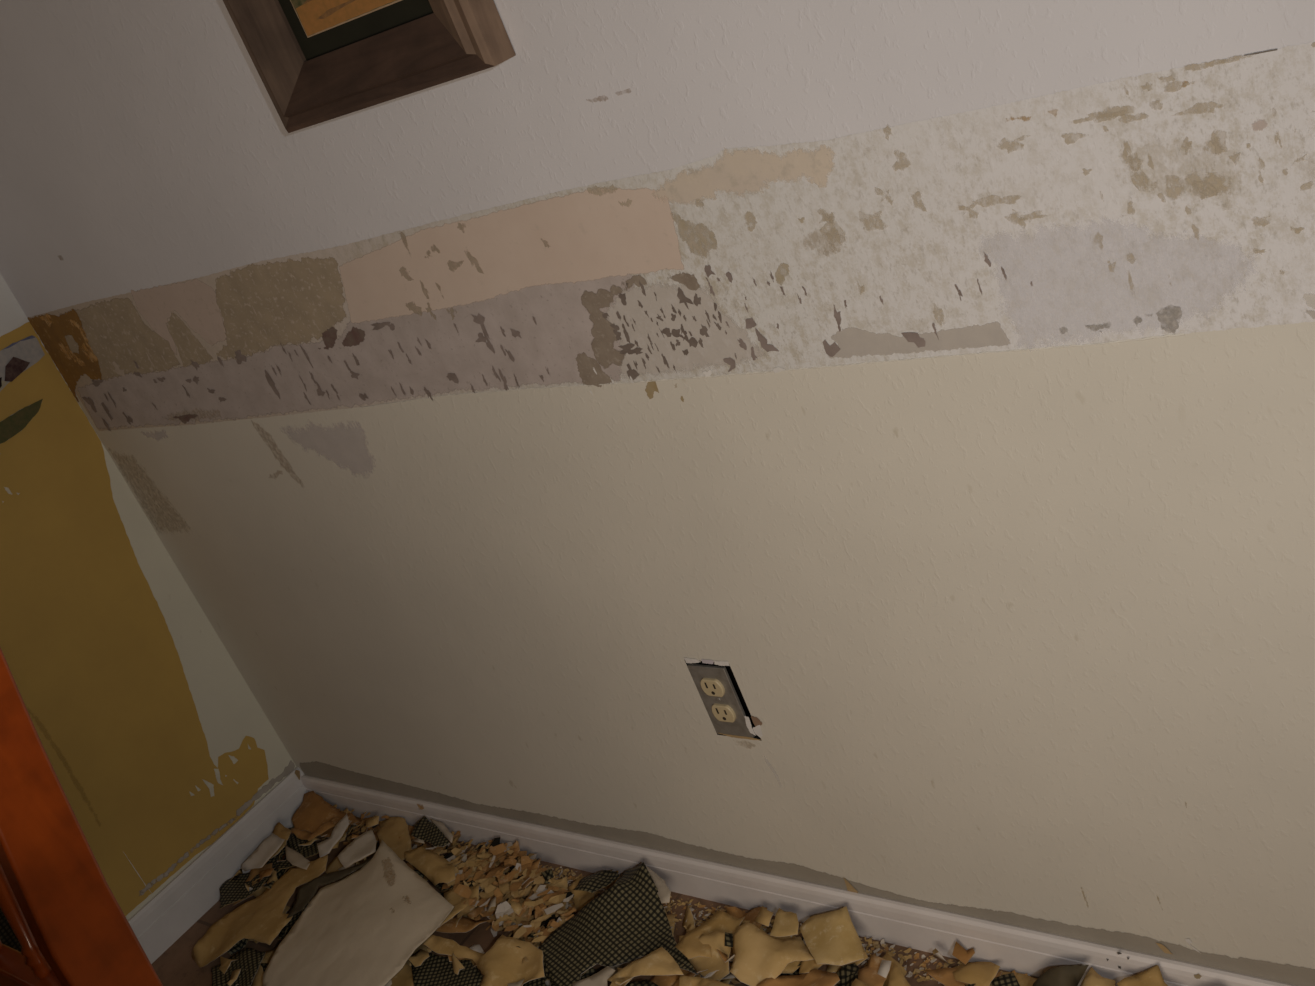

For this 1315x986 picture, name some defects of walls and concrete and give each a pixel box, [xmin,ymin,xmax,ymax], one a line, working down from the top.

peeling [29,42,1315,431]